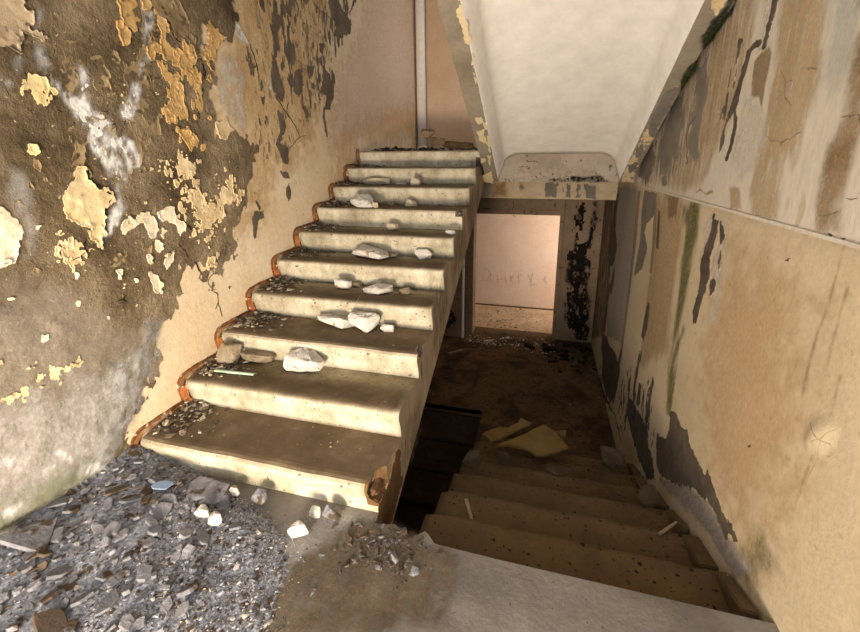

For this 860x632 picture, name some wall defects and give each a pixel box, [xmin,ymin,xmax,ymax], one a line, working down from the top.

efflorescence [51,68,141,180]
peeling [456,0,478,84]
peeling [475,117,494,184]
peeling [703,0,735,39]
peeling [719,0,778,161]
efflorescence [108,199,123,234]
flaking render [0,0,356,534]
crack [167,194,222,316]
peeling [505,165,597,341]
peeling [598,54,738,542]